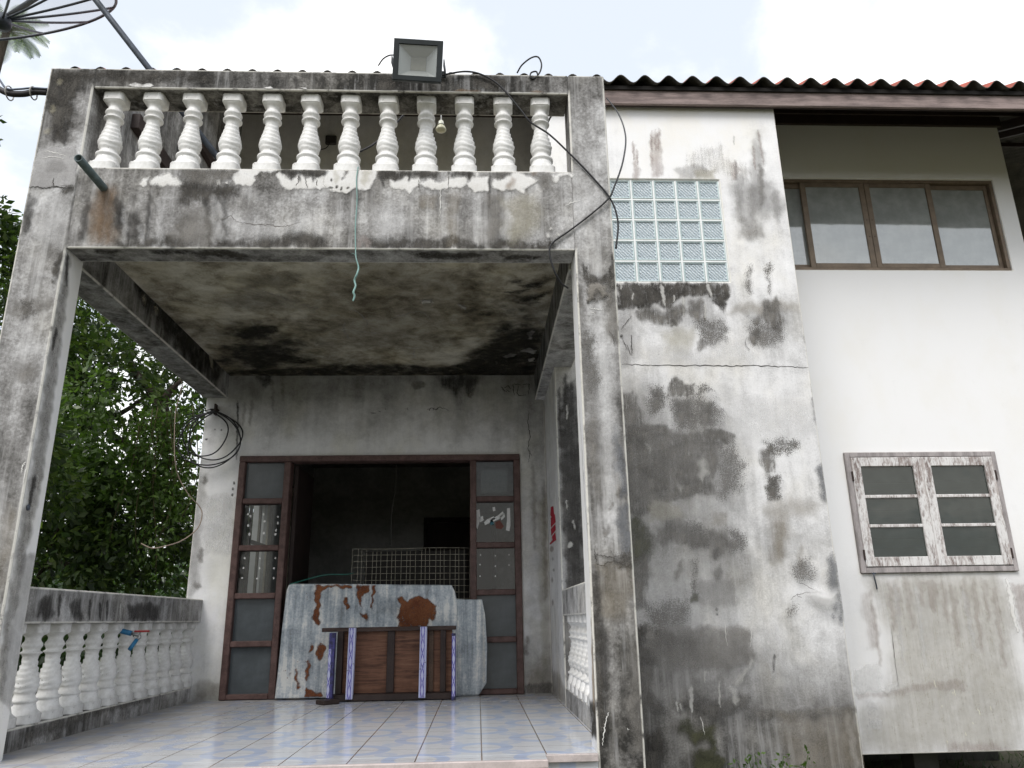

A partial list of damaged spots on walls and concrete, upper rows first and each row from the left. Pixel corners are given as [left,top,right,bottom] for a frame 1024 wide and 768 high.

peeling [140,173,184,187]
leakage [96,169,326,260]
peeling [216,170,377,194]
leakage [134,280,547,397]
leakage [578,256,730,356]
crack [622,335,808,368]
leakage [743,261,785,350]
leakage [605,378,749,571]
leakage [761,436,800,500]
leakage [558,330,607,750]
leakage [38,595,159,621]
leakage [627,519,857,720]